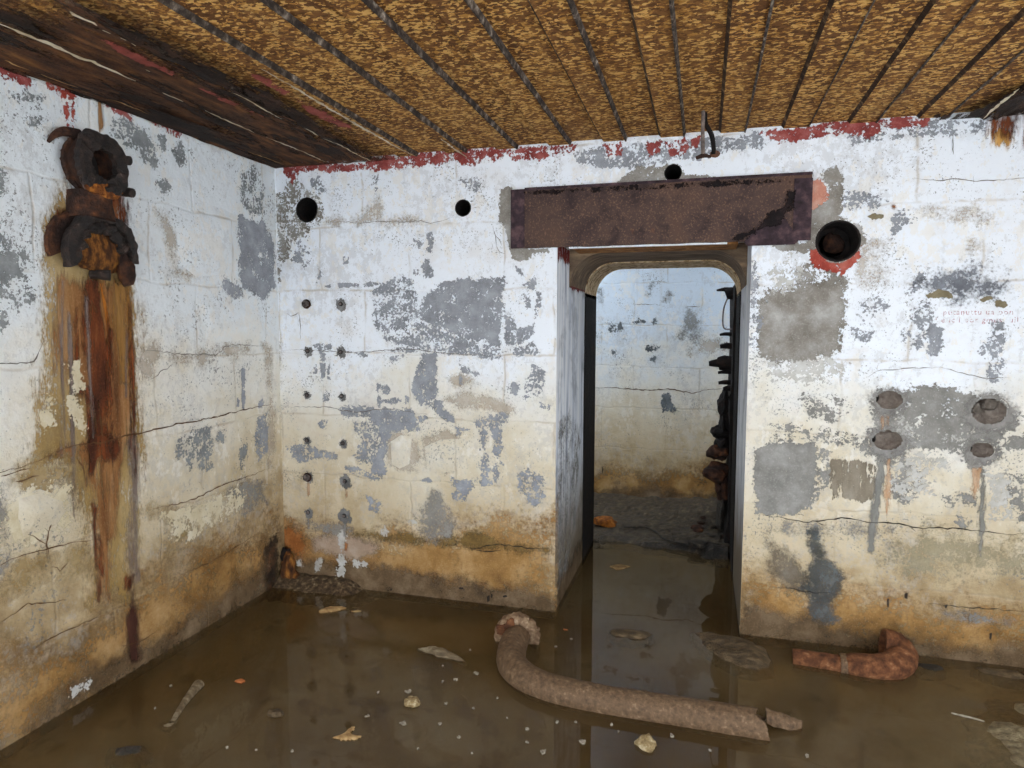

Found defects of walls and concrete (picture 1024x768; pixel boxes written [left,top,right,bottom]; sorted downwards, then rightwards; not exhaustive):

rust [77,102,103,151]
peeling [0,0,1024,544]
rust [524,179,796,242]
rust [21,166,147,663]
crack [0,405,267,482]
water stain [0,419,582,748]
water stain [739,523,1024,668]
crack [762,514,1019,535]